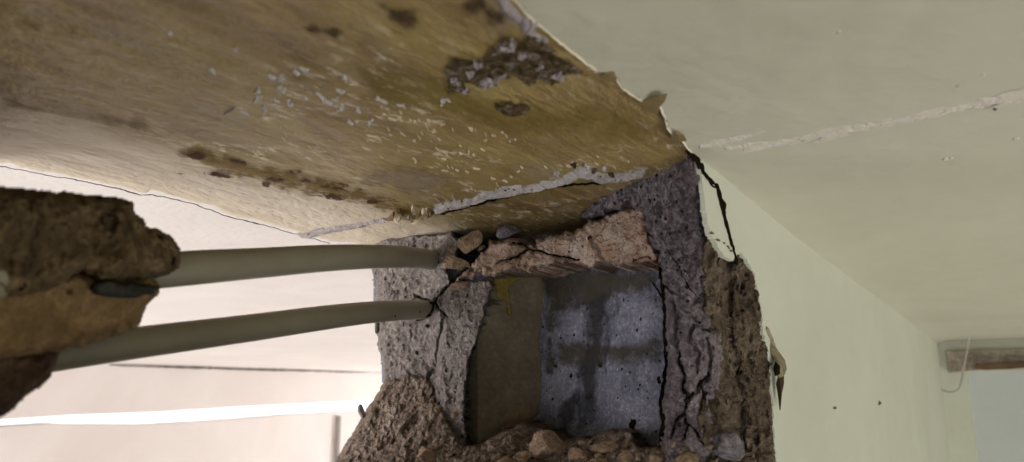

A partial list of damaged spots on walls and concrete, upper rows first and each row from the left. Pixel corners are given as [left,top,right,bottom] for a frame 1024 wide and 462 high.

water stain [224,67,374,127]
spalling [444,0,693,153]
peeling [387,194,456,223]
peeling [366,106,523,191]
crack [440,182,600,215]
crack [685,89,1024,266]
crack [416,238,580,321]
crack [632,250,733,462]
peeling [766,326,787,410]